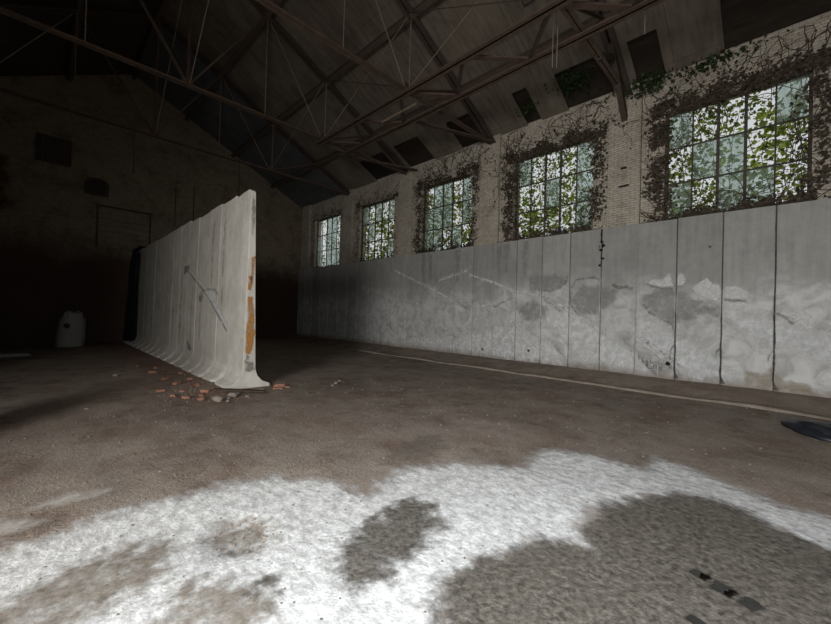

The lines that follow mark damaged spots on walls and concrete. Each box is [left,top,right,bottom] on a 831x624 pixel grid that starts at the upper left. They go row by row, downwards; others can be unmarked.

corrosion [246,257,255,354]
water stain [381,254,732,380]